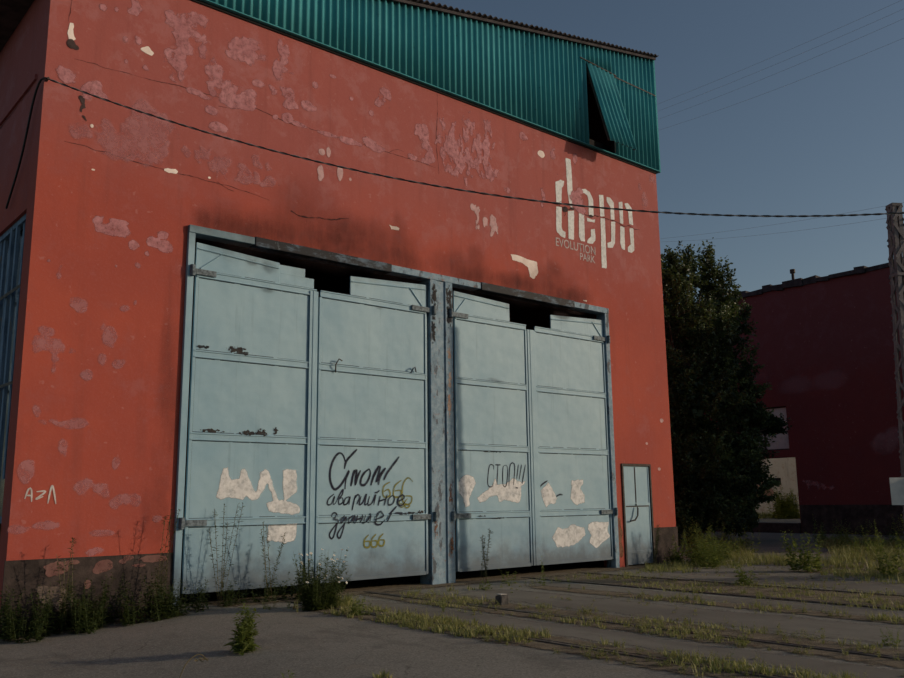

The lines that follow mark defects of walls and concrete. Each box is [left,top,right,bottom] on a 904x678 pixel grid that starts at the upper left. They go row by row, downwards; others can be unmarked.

peeling [123,10,317,133]
peeling [408,111,499,186]
peeling [92,216,173,268]
flaking render [36,560,80,611]
peeling [84,547,167,589]